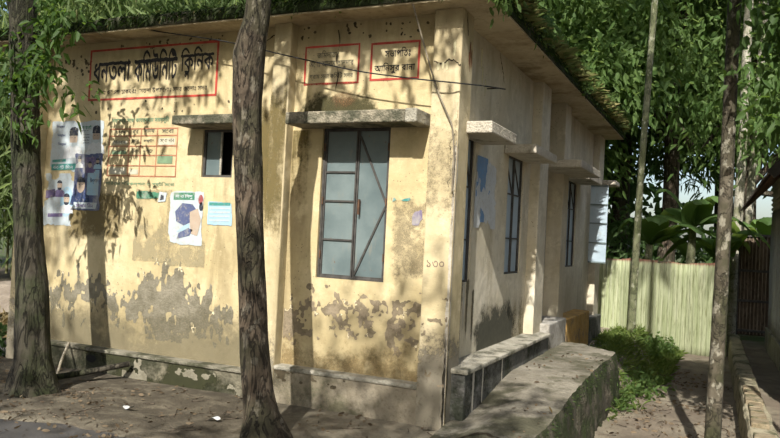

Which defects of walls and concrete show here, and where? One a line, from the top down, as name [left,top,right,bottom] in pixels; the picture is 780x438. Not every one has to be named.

water stain [302,22,377,112]
water stain [69,193,121,239]
flaking render [48,257,233,343]
flaking render [283,141,458,426]
spalling [122,359,147,381]
spalling [175,368,216,380]